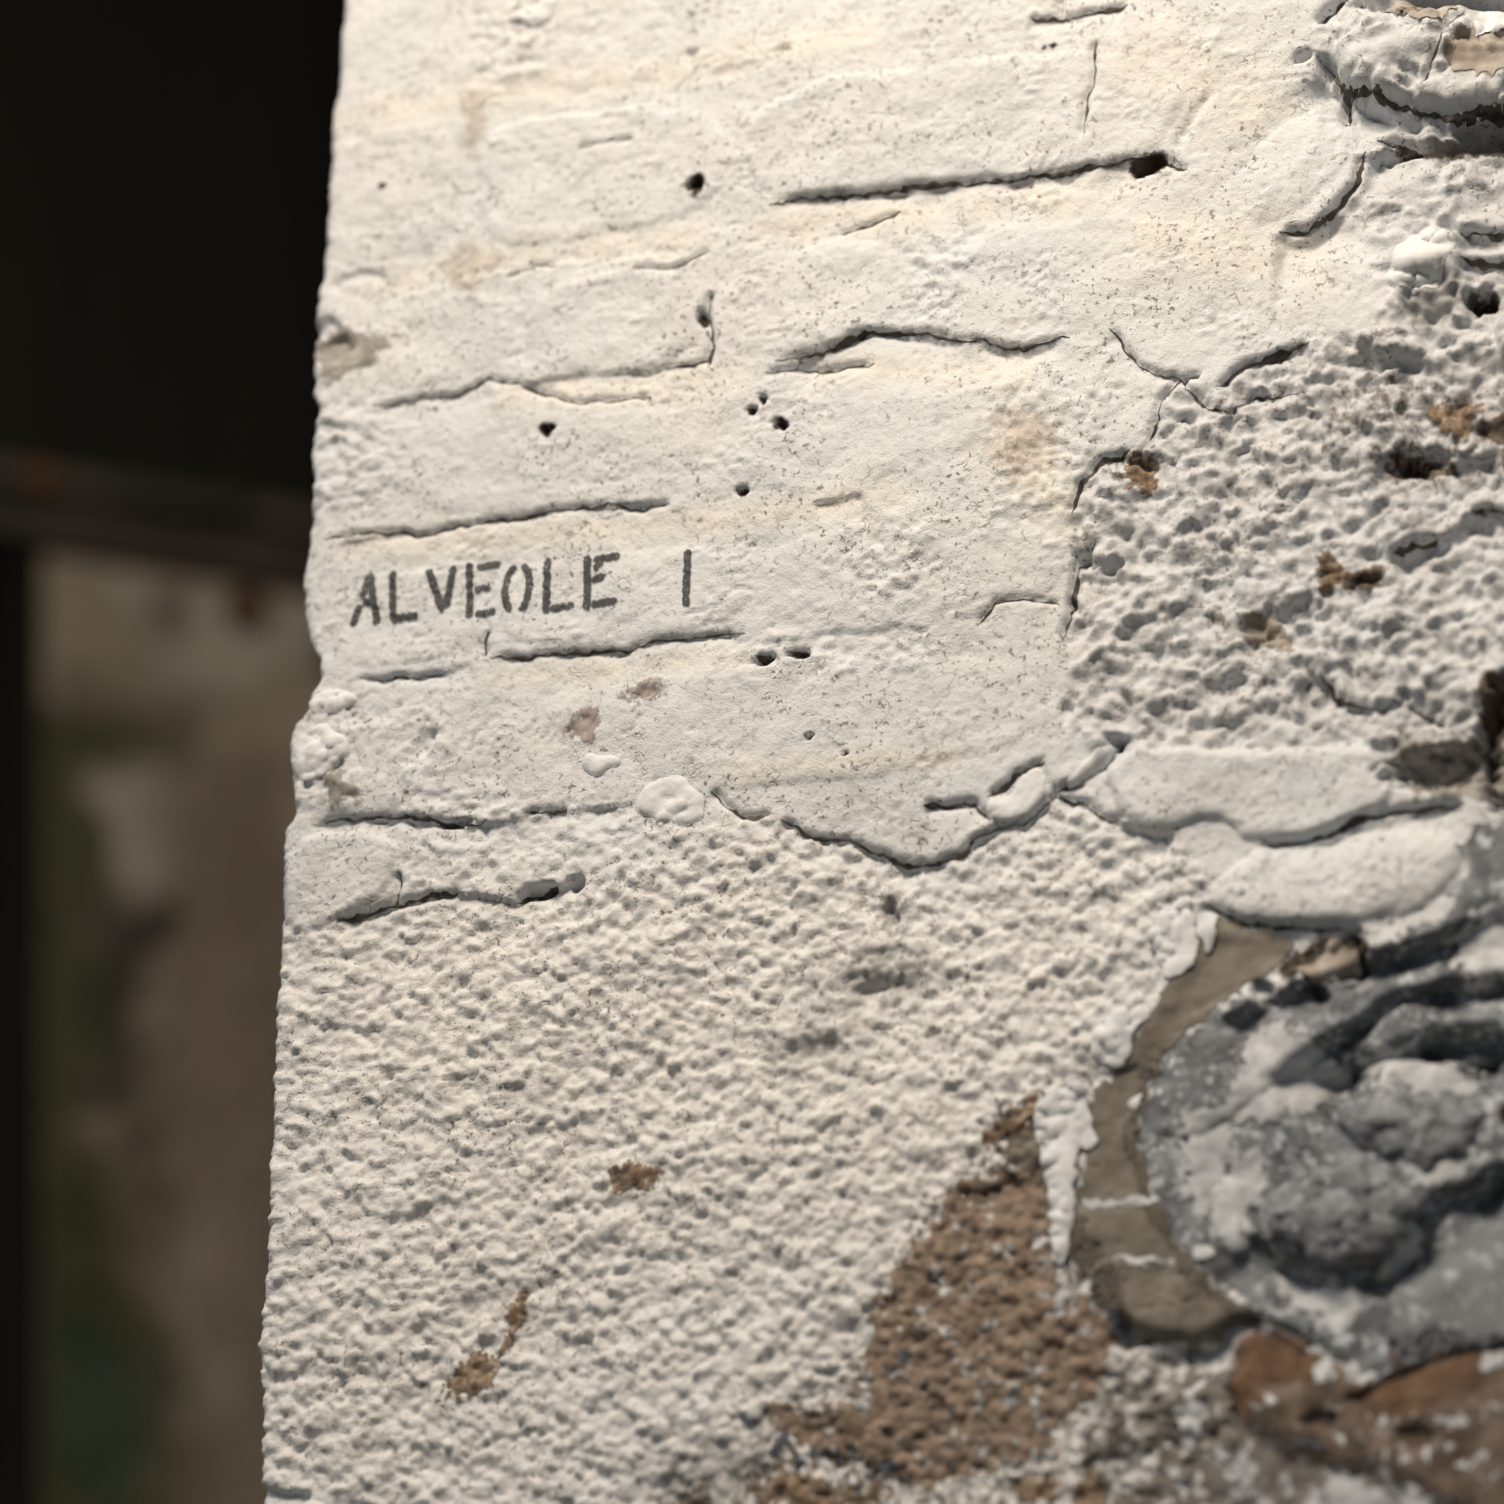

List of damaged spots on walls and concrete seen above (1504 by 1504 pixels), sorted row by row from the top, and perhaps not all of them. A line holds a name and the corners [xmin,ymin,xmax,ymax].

crack [1072,328,1309,512]
spalling [1323,375,1504,493]
crack [977,542,1095,640]
spalling [679,670,1504,1504]